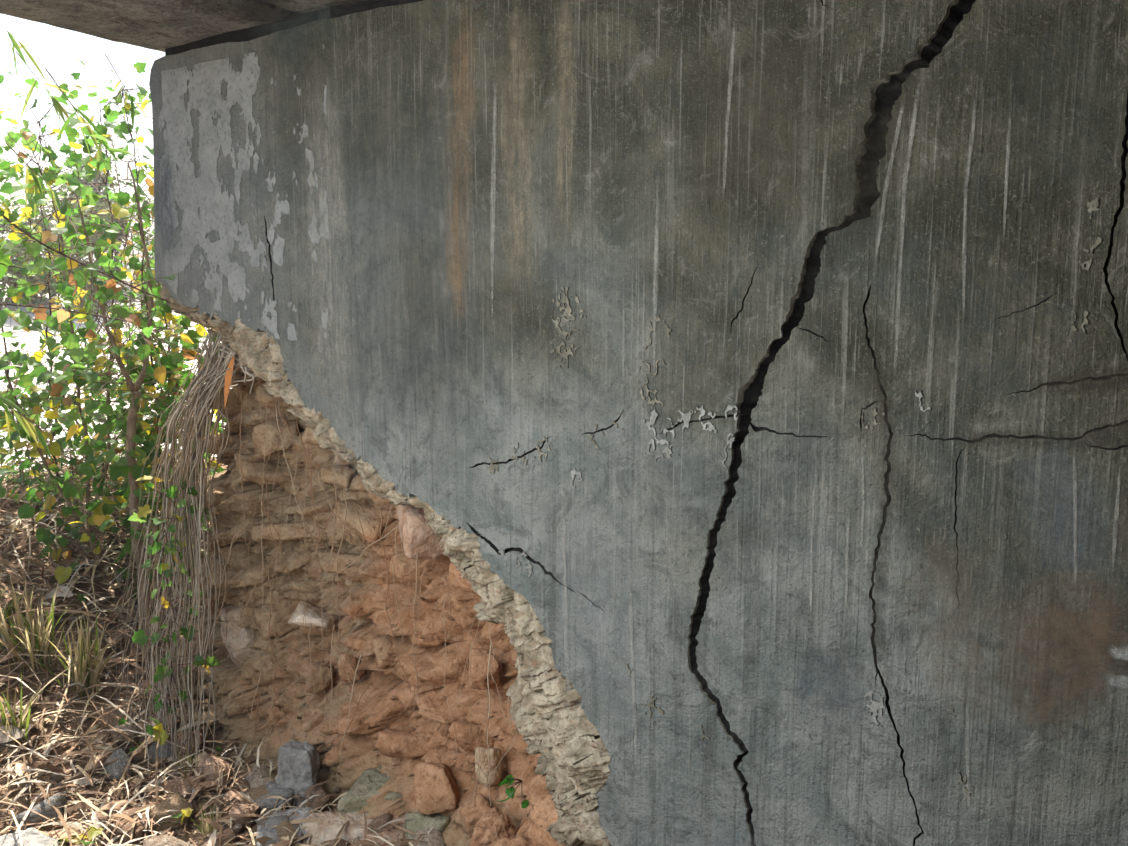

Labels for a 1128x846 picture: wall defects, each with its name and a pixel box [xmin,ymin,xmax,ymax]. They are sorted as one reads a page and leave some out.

crack [1007,93,1128,395]
spalling [157,52,612,846]
crack [469,436,551,468]
crack [465,522,604,612]
crack [582,411,624,435]
crack [660,0,976,846]
crack [860,281,1128,846]